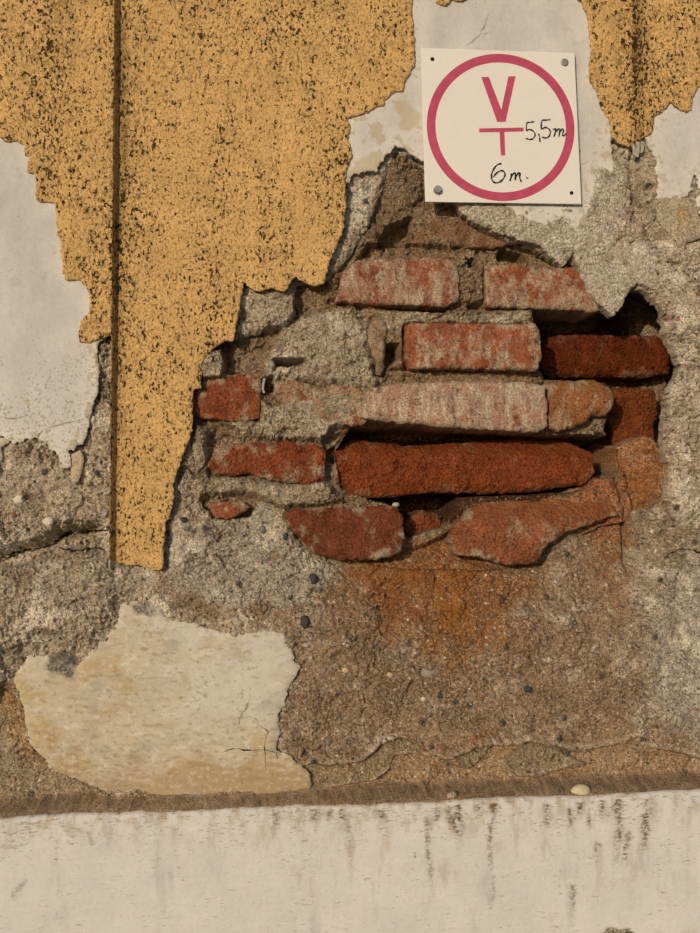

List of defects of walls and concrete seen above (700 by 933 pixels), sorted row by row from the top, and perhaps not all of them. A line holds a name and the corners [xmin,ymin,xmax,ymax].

crack [0,521,109,562]
flaking render [0,137,111,562]
peeling [0,601,312,795]
spalling [110,0,700,765]